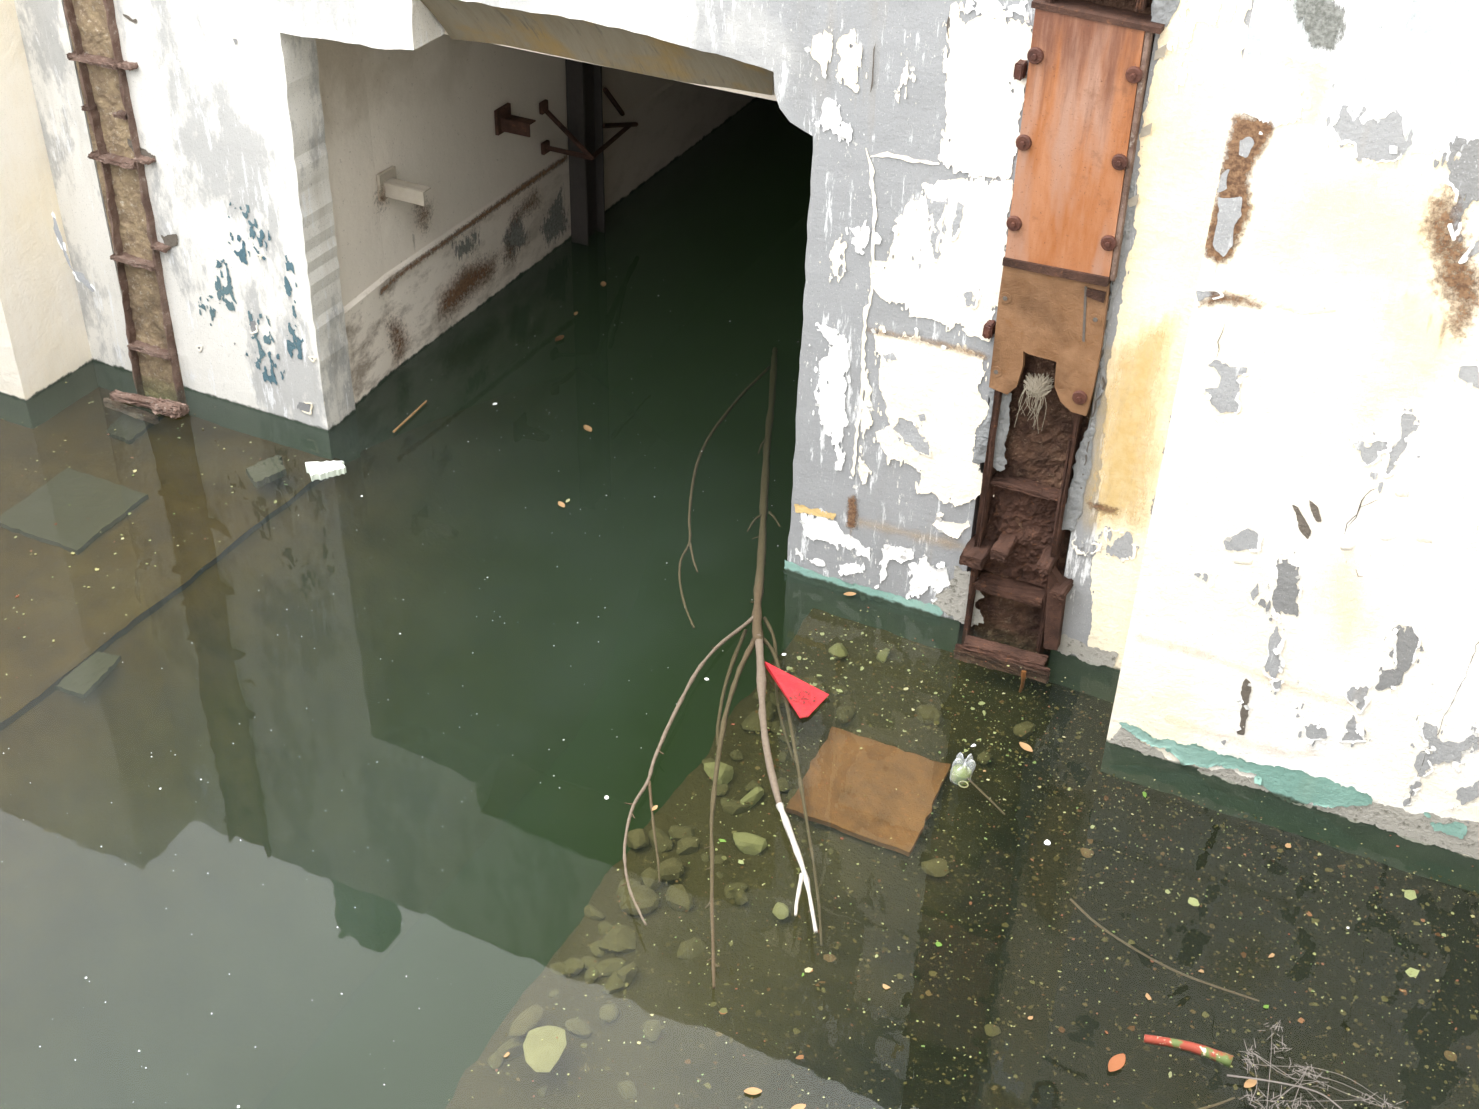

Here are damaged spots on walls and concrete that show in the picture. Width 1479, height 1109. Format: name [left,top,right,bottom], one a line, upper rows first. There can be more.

rust [386,318,407,359]
rust [380,155,568,317]
peeling [804,0,1032,538]
leakage [1099,334,1162,516]
rust [1204,114,1273,263]
peeling [1062,0,1479,703]
rust [1422,191,1479,338]
peeling [783,508,950,619]
rust [1088,502,1118,513]
peeling [1119,552,1373,808]
peeling [1295,620,1424,747]
peeling [1403,716,1479,839]